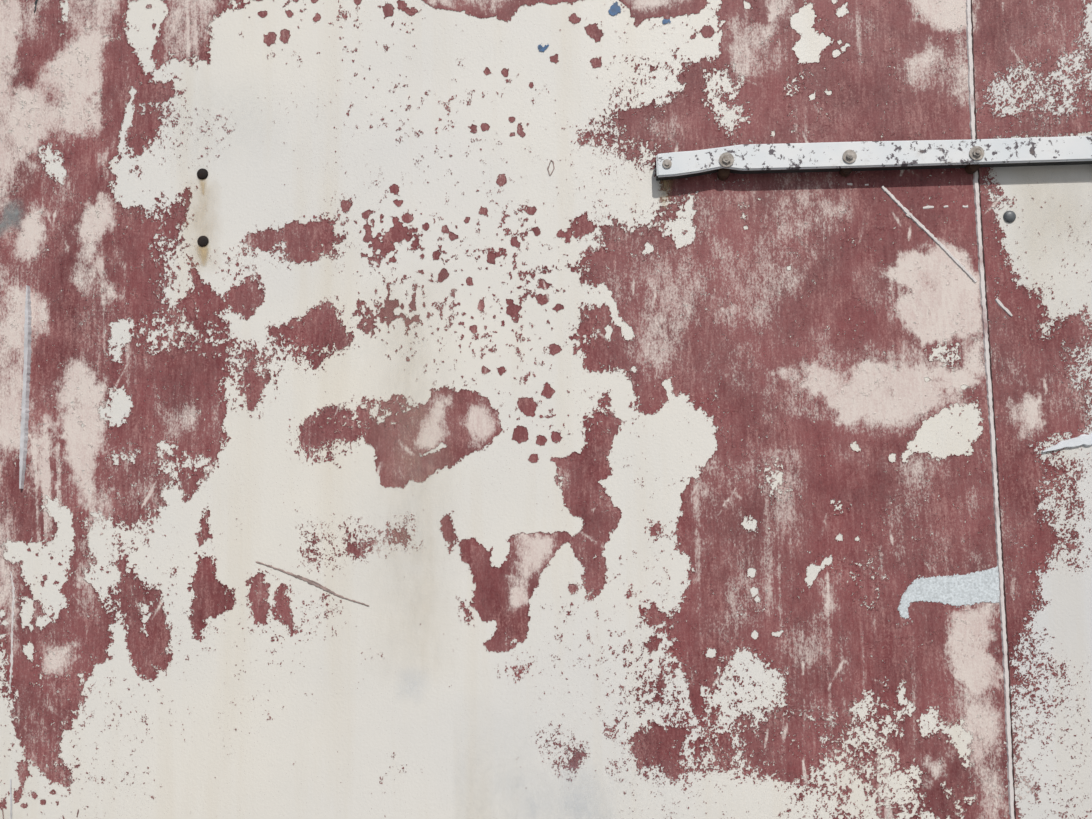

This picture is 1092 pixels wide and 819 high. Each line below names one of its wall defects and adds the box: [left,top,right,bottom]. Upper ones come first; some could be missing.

peeling [263,0,380,89]
peeling [377,0,604,42]
peeling [538,44,559,63]
peeling [333,67,519,143]
peeling [465,120,490,183]
peeling [493,117,529,150]
peeling [464,174,522,236]
peeling [184,503,346,651]
peeling [292,513,423,577]
peeling [531,714,590,789]